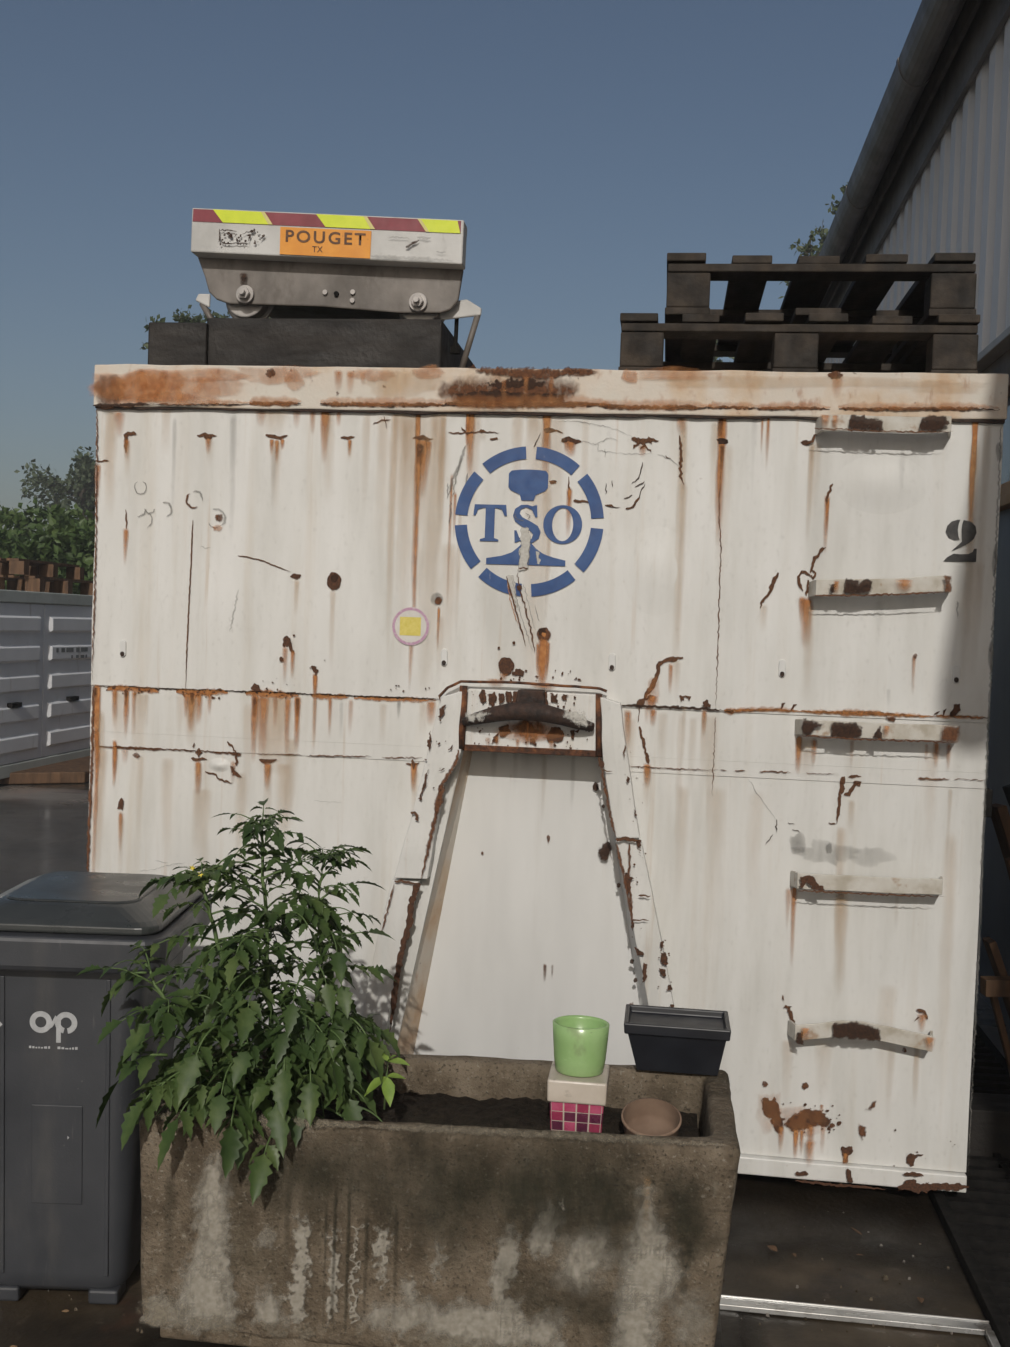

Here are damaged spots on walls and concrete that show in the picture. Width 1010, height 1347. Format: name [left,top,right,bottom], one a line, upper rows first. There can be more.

corrosion [86,365,1005,872]
corrosion [381,750,459,1030]
corrosion [598,757,650,921]
corrosion [792,888,944,918]
corrosion [782,995,809,1035]
corrosion [795,1171,969,1194]